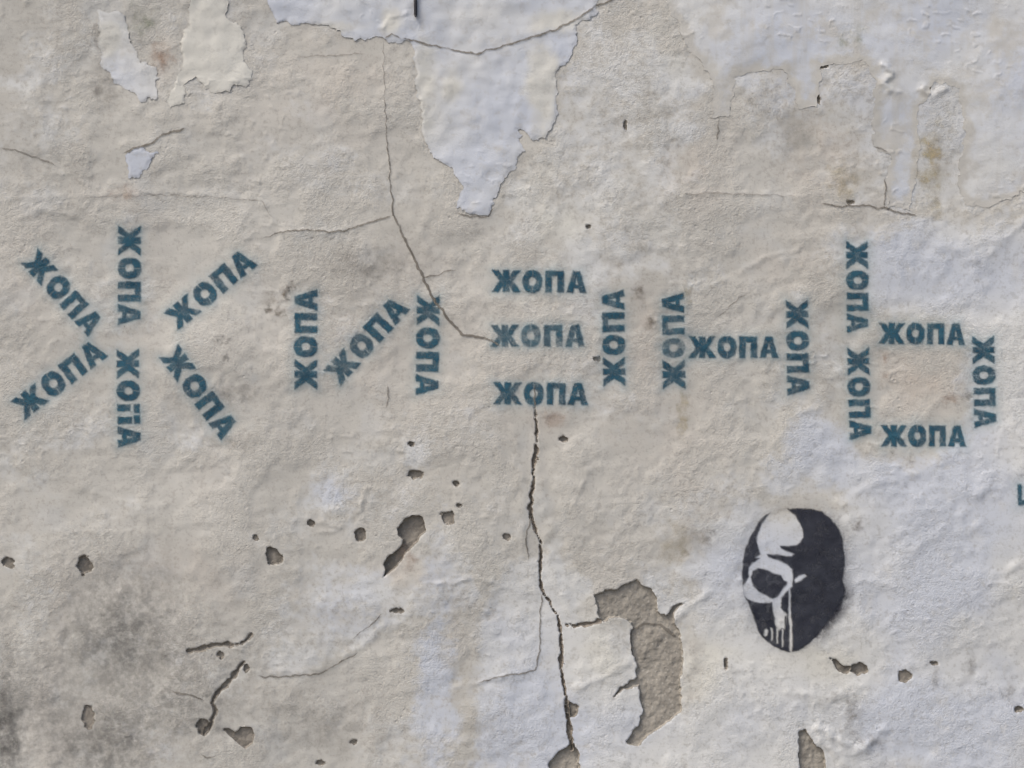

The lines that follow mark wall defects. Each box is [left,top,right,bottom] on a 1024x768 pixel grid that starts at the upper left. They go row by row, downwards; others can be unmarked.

peeling [96,0,253,108]
peeling [267,0,598,215]
peeling [125,147,158,179]
crack [271,104,498,345]
crack [824,180,915,215]
spalling [382,515,426,578]
crack [483,388,581,768]
crack [175,633,355,758]
spalling [565,579,684,746]
spalling [798,729,826,768]
spalling [829,658,869,676]